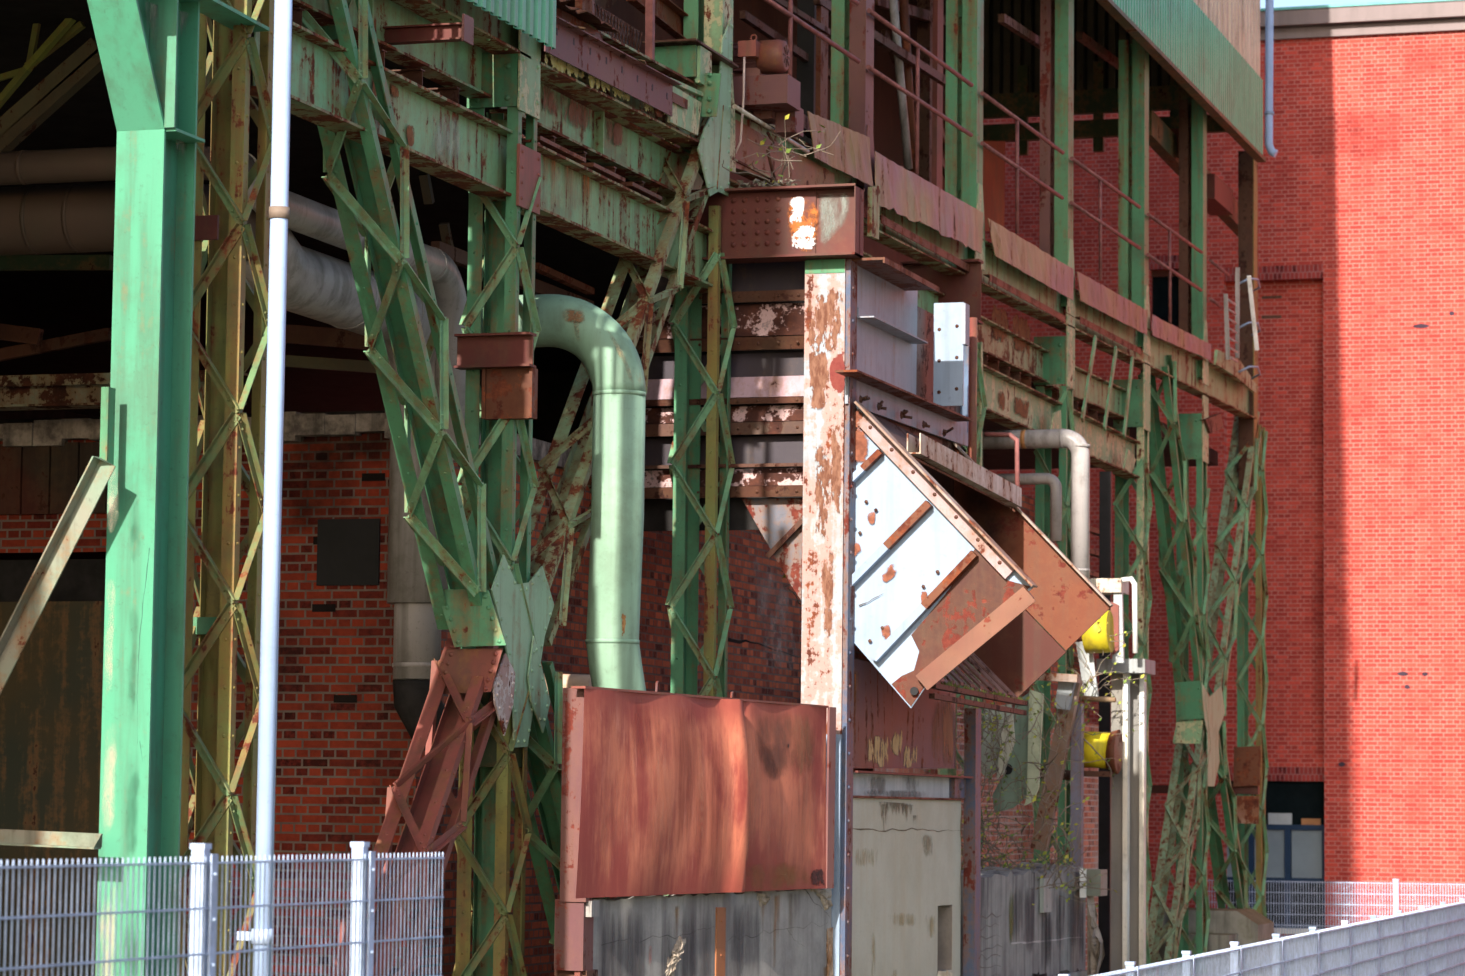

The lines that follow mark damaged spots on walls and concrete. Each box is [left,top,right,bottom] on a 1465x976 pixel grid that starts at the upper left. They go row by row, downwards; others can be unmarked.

rust [407,125,415,146]
peeling [788,197,818,250]
rust [968,494,999,543]
rust [882,565,896,582]
damp [669,926,707,976]